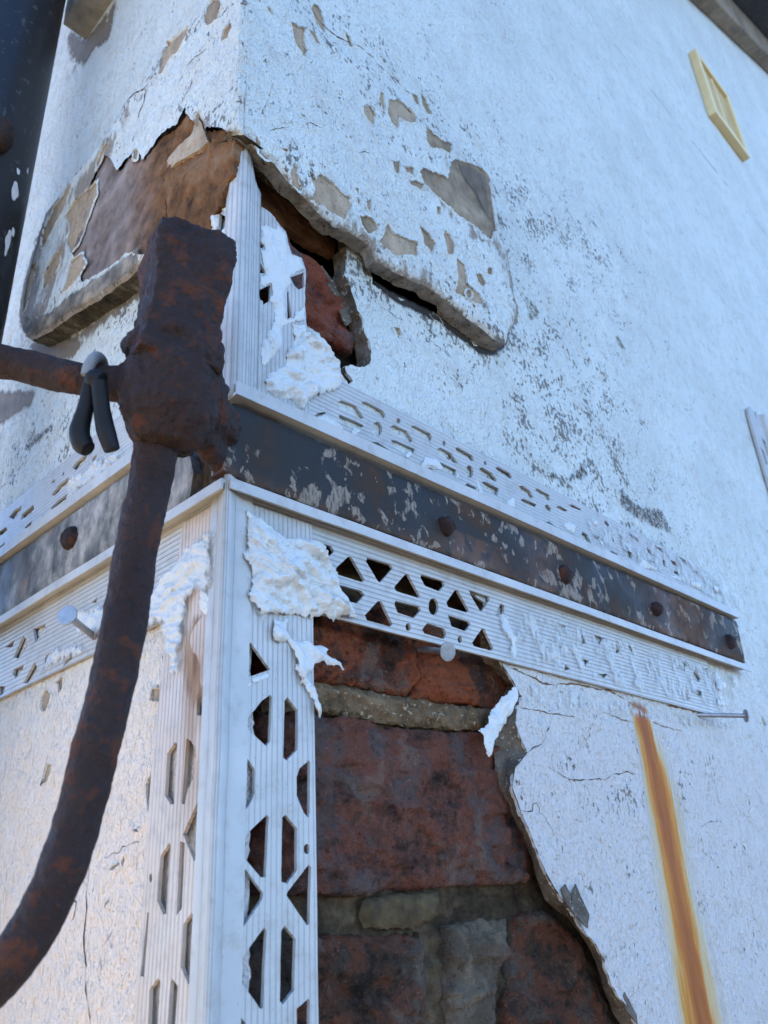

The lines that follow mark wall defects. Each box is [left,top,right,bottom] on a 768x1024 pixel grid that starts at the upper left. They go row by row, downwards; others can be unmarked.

peeling [362,90,498,240]
spalling [21,114,505,384]
crack [523,708,574,753]
spalling [478,629,638,1024]
crack [554,770,633,781]
crack [512,668,695,731]
rust [632,703,722,1024]